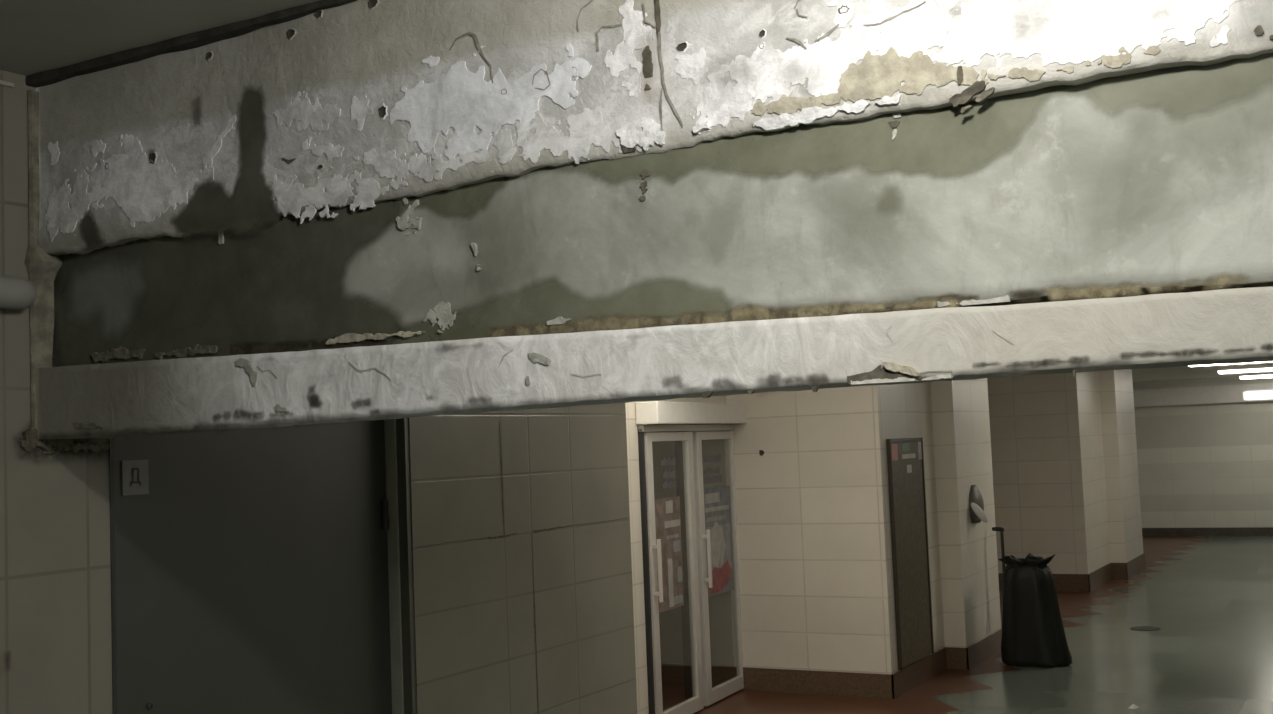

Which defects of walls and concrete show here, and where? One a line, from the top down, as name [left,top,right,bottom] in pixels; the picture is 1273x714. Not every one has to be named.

peeling [44,114,236,242]
water stain [52,88,729,367]
crack [577,0,683,131]
peeling [270,0,1239,224]
water stain [525,53,1273,183]
spalling [235,358,258,387]
spalling [326,330,443,345]
spalling [525,353,552,385]
spalling [937,295,1010,307]
spalling [16,422,110,460]